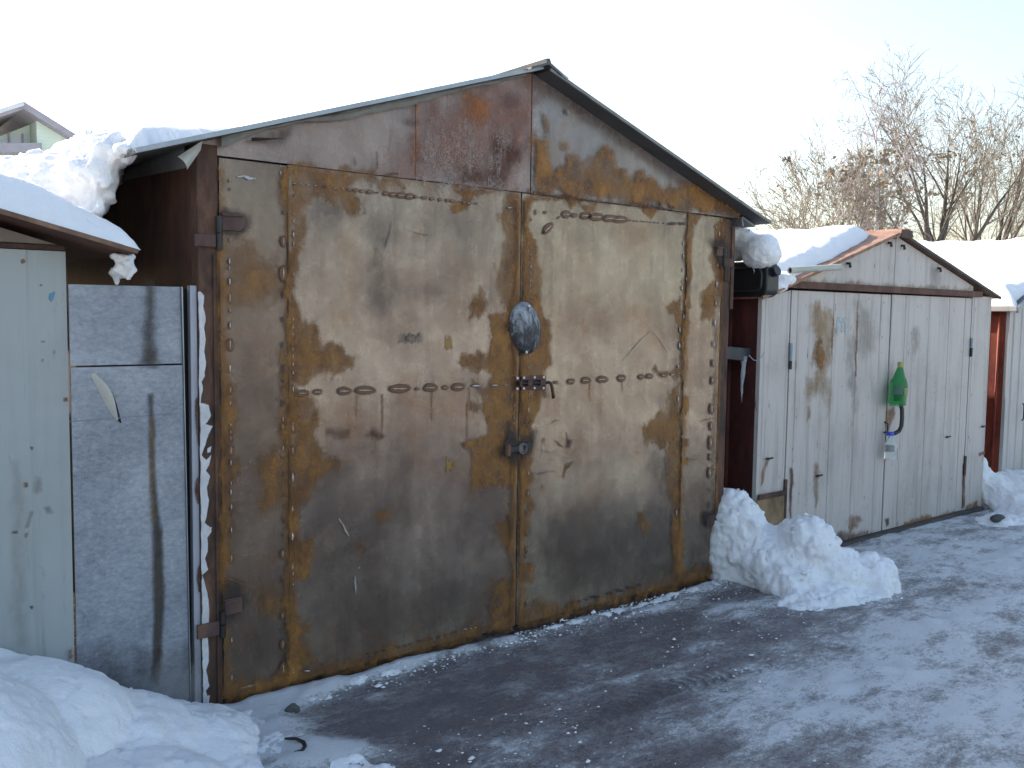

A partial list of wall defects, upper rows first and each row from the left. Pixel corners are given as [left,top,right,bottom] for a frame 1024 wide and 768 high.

damp [149,395,164,683]
rust [217,241,239,593]
rust [223,111,740,702]
rust [814,305,834,370]